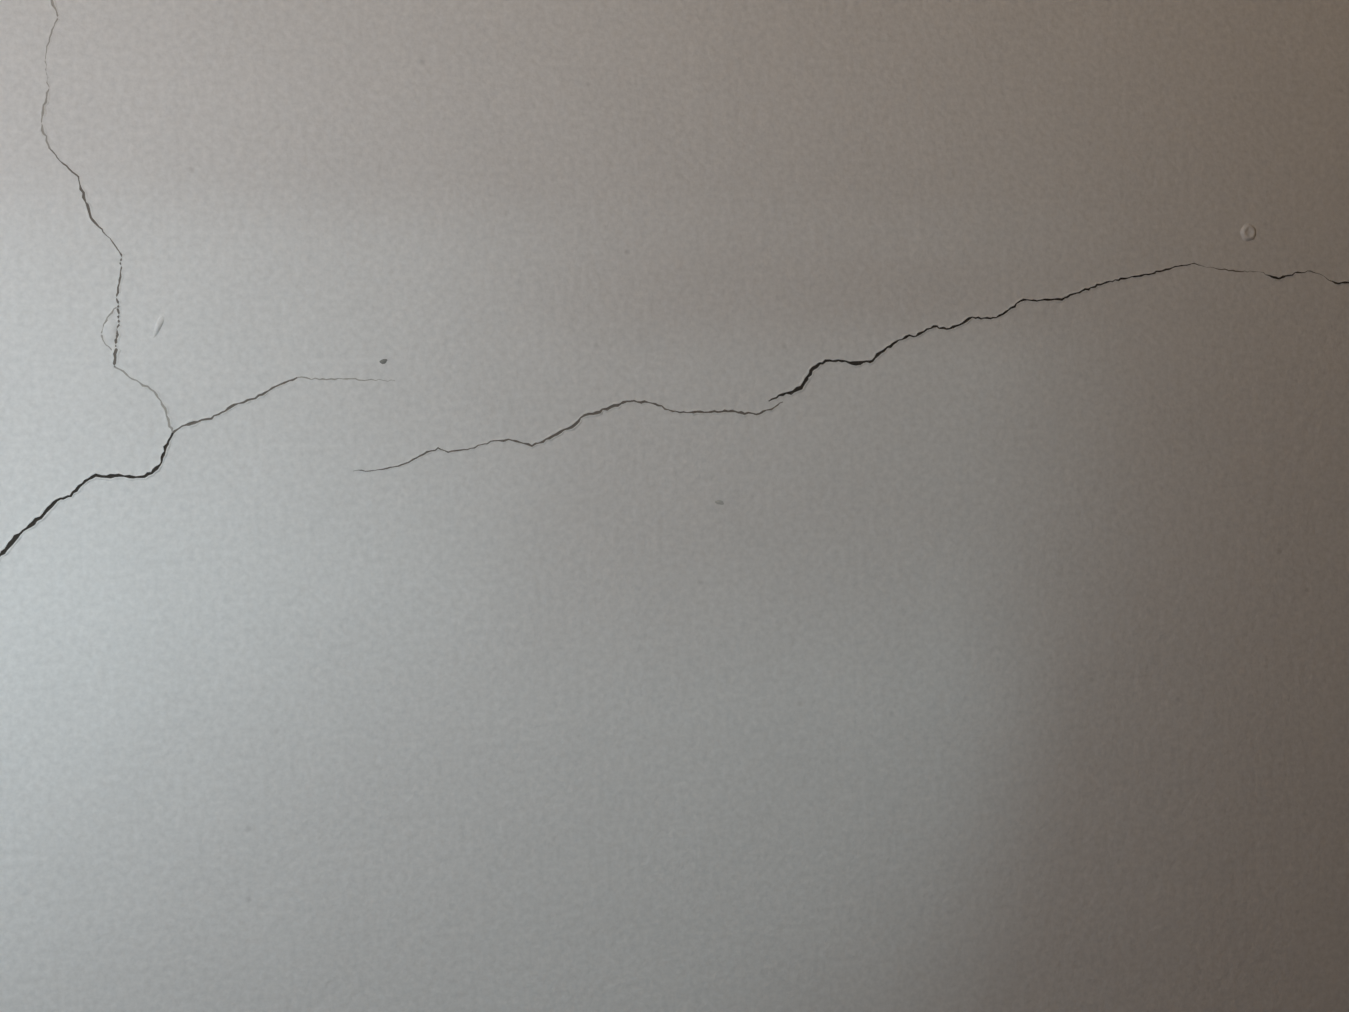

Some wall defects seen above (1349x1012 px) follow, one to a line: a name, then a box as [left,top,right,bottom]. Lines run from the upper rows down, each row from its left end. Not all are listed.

crack [0,0,395,562]
crack [353,261,1349,473]